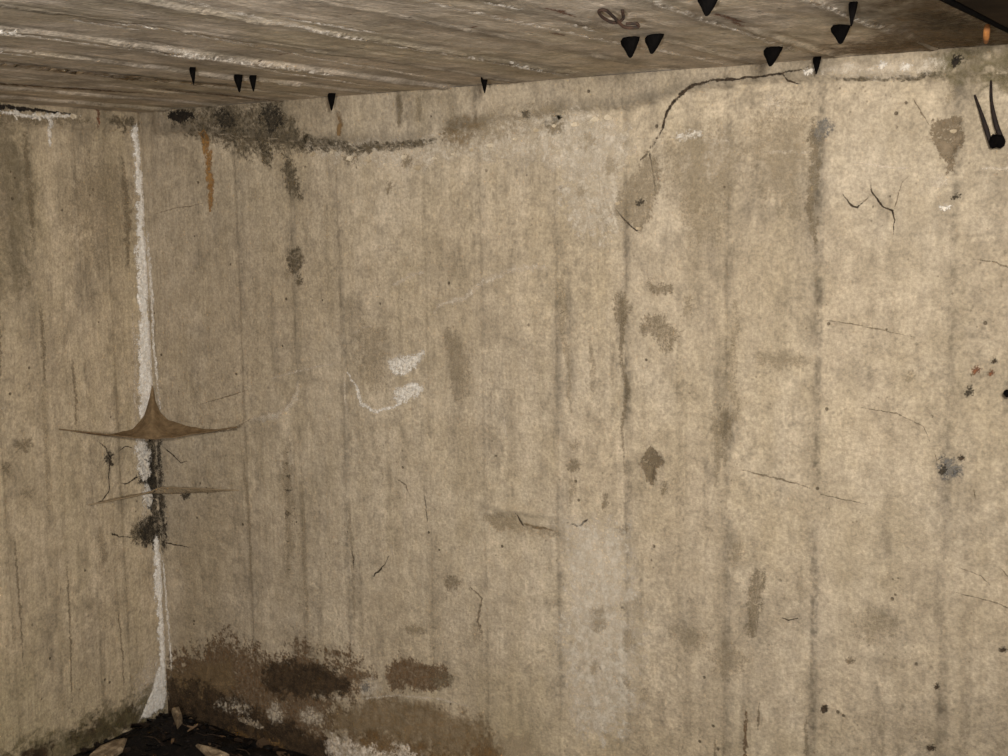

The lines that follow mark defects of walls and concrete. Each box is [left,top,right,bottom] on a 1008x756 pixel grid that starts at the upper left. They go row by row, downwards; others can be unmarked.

corrosion [200,130,214,212]
water stain [0,51,481,199]
crack [640,67,808,193]
water stain [614,295,632,457]
water stain [6,439,539,756]
water stain [747,573,766,638]
water stain [742,703,760,756]